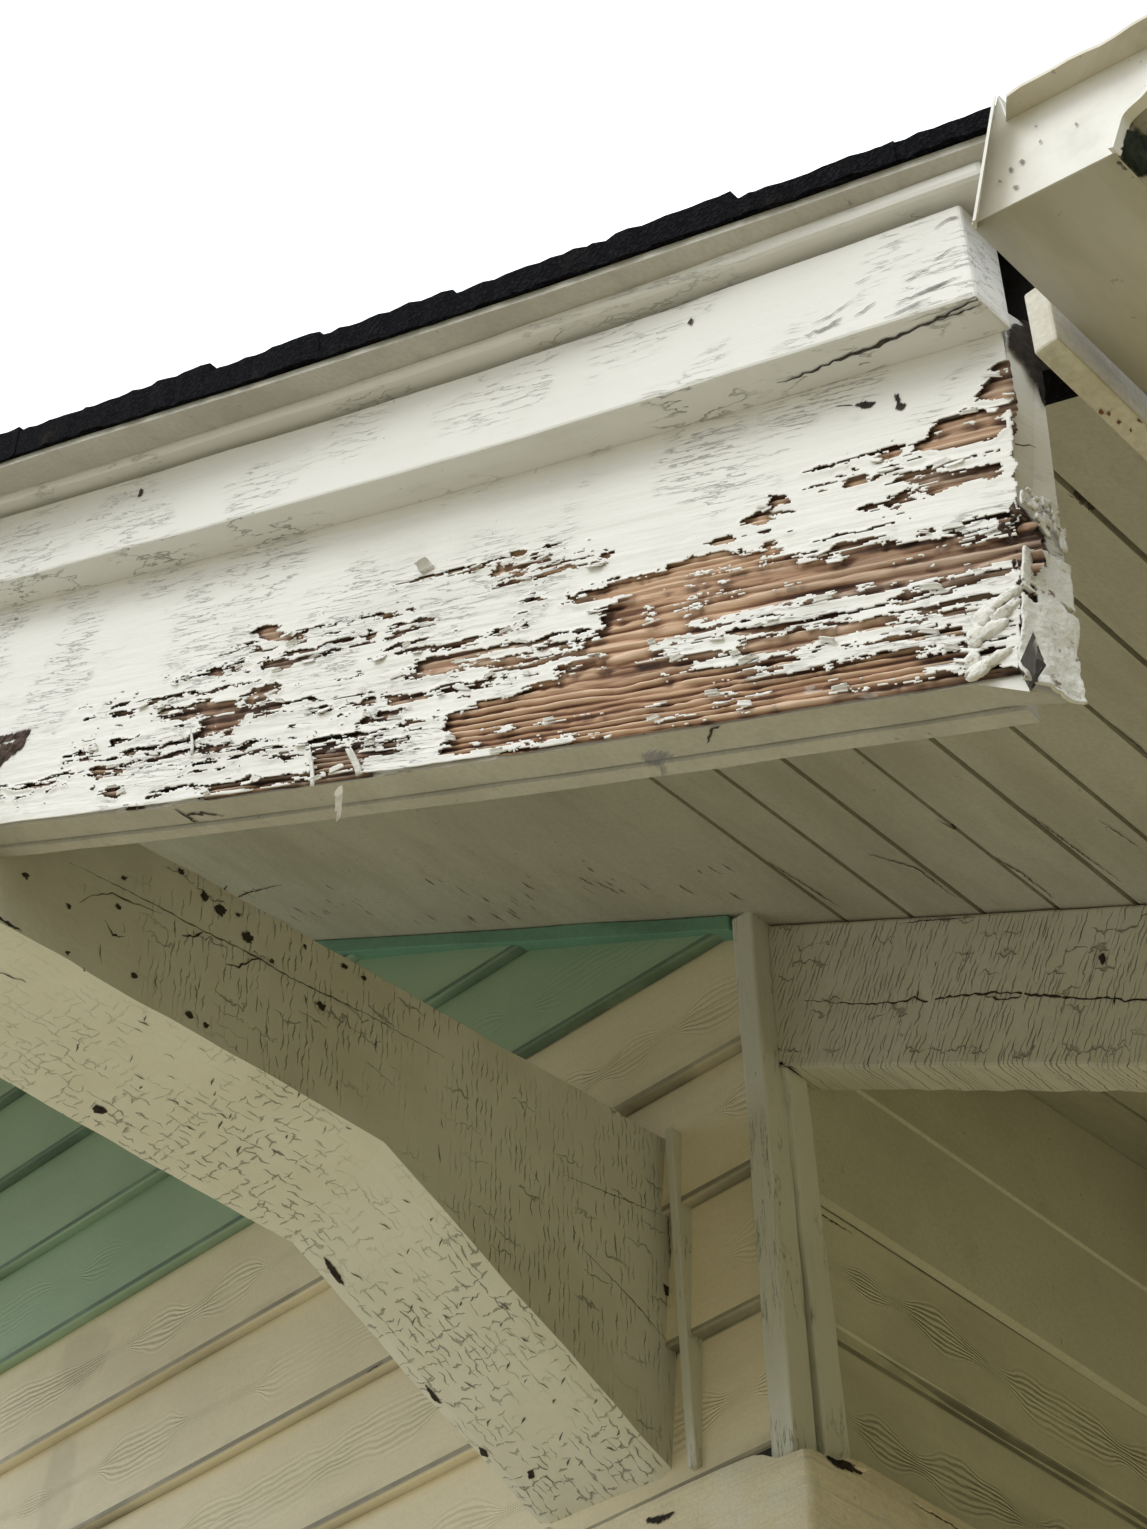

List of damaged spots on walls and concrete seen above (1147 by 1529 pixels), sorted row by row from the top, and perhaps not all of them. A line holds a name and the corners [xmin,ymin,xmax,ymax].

crack [777,299,981,383]
peeling [0,360,1088,811]
crack [0,917,21,931]
crack [784,927,1147,1066]